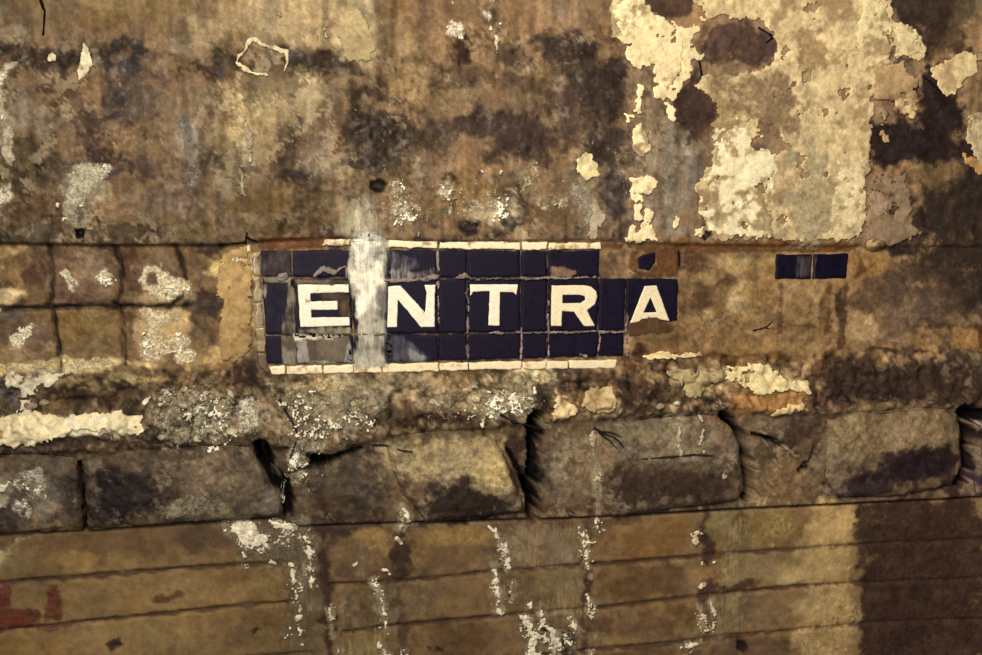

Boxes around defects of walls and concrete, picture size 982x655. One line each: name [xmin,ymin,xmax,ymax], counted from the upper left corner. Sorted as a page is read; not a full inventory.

crack [38,0,46,36]
peeling [609,0,982,251]
peeling [0,369,144,449]
water stain [230,378,411,655]
crack [309,447,362,464]
water stain [423,517,605,655]
peeling [643,351,812,417]
water stain [680,508,795,655]
water stain [798,497,982,655]